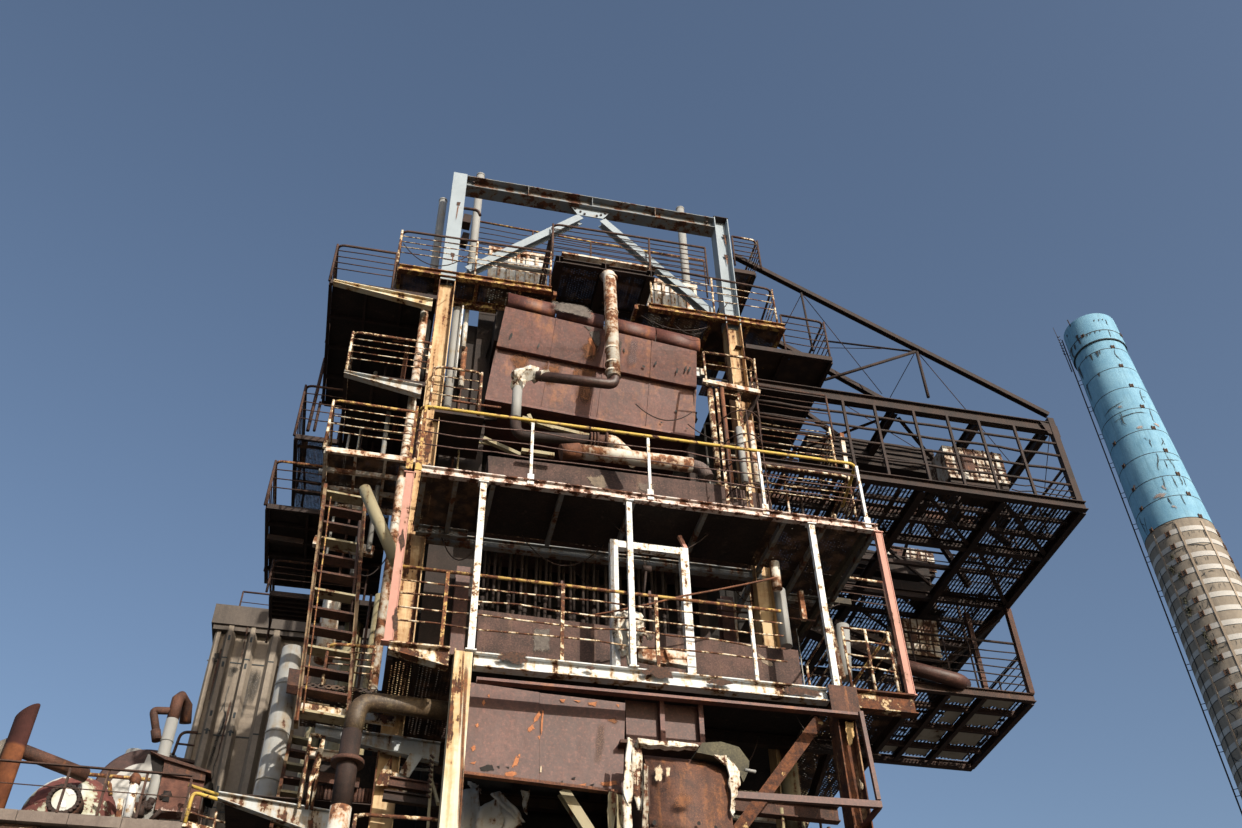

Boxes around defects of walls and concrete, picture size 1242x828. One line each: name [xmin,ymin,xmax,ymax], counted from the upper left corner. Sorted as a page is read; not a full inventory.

rust [512,356,529,368]
rust [544,338,598,402]
rust [497,652,528,665]
rust [784,686,822,697]
rust [458,654,468,828]
peeling [655,765,670,781]